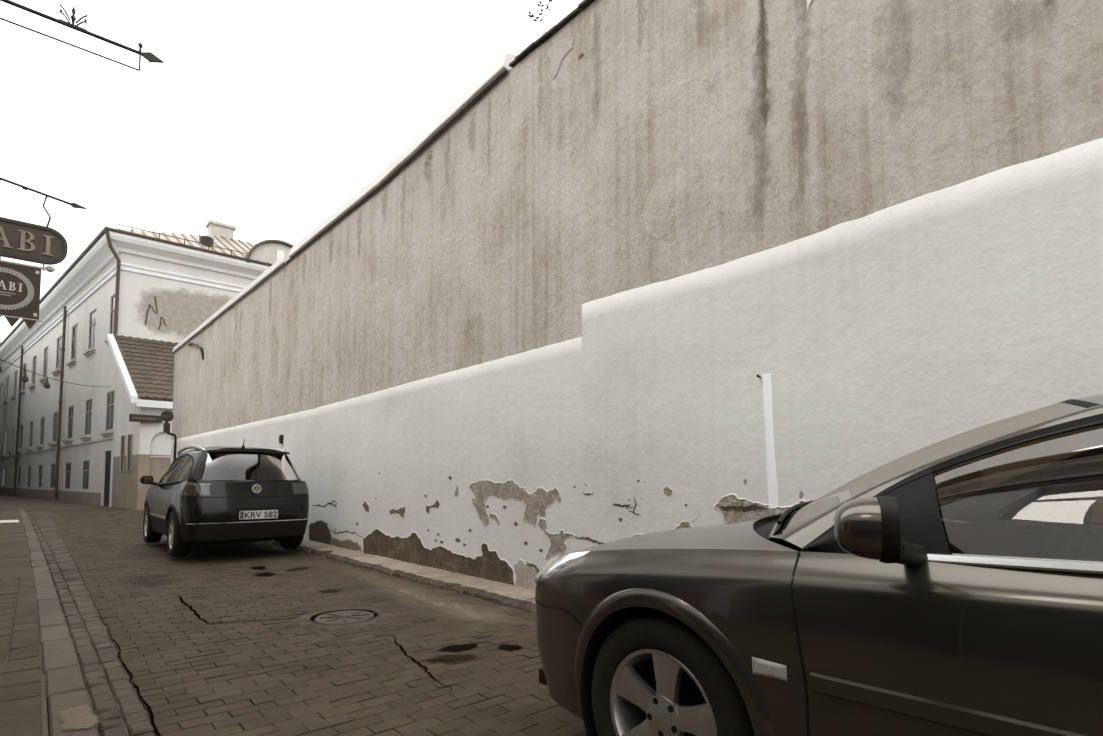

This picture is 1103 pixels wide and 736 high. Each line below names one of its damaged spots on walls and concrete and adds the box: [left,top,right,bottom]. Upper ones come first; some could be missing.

leakage [750,0,770,180]
peeling [363,475,603,590]
peeling [672,521,693,530]
spalling [714,479,808,524]
crack [393,637,453,690]